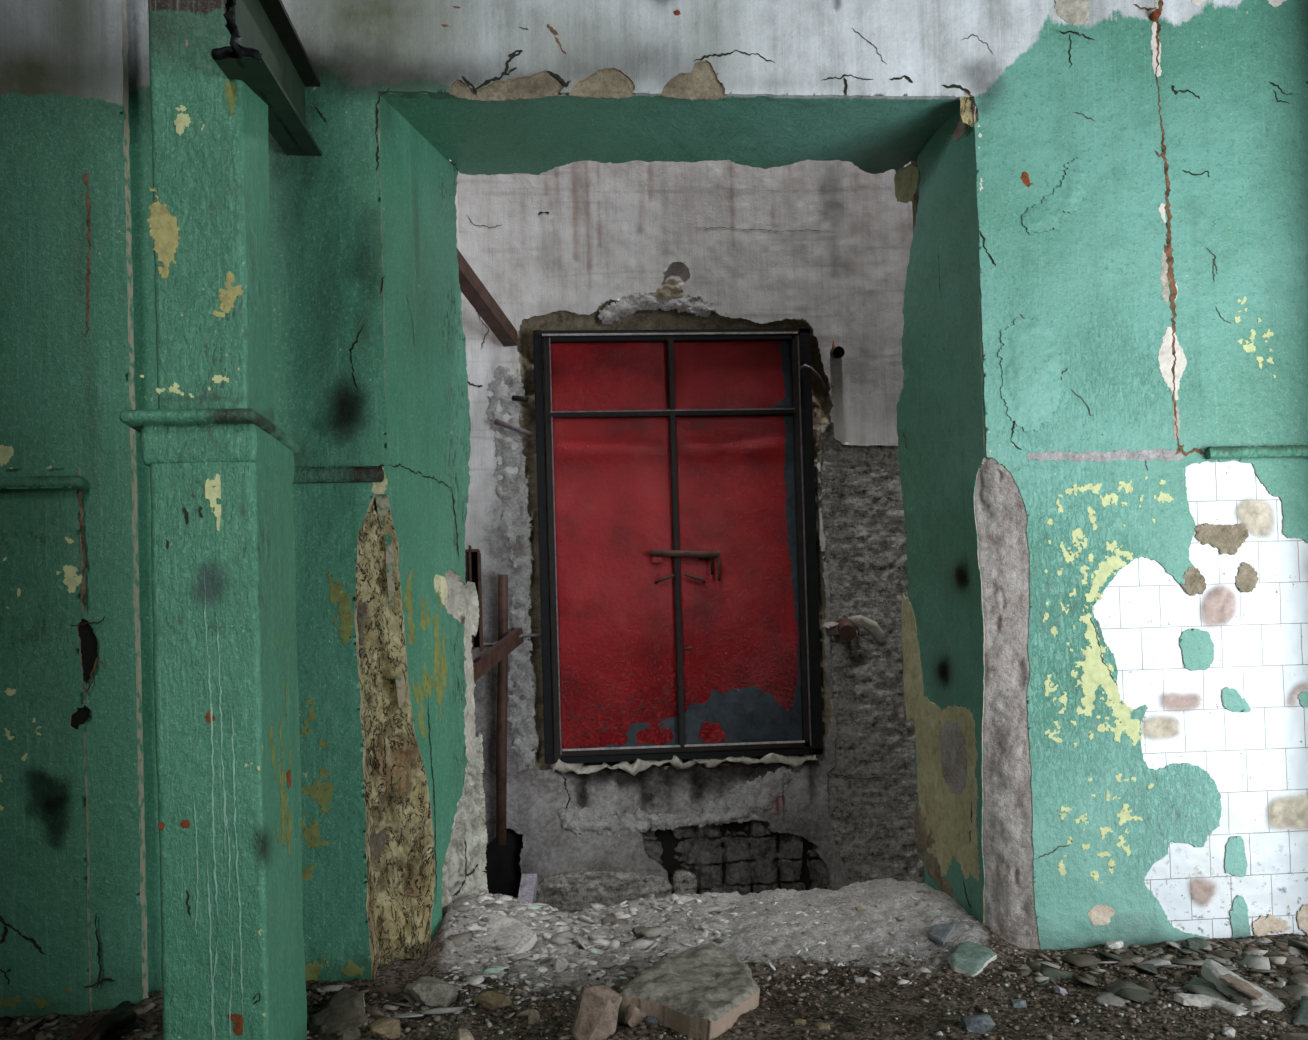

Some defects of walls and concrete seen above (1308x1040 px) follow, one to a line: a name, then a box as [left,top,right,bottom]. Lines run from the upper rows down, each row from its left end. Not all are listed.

spalling [449,69,635,101]
spalling [658,61,726,101]
crack [821,29,971,95]
peeling [147,188,181,279]
crack [1133,0,1209,470]
crack [1207,248,1231,324]
crack [379,463,459,556]
flaking render [486,261,1308,949]
peeling [257,681,334,855]
spalling [301,467,488,982]
crack [0,916,46,985]